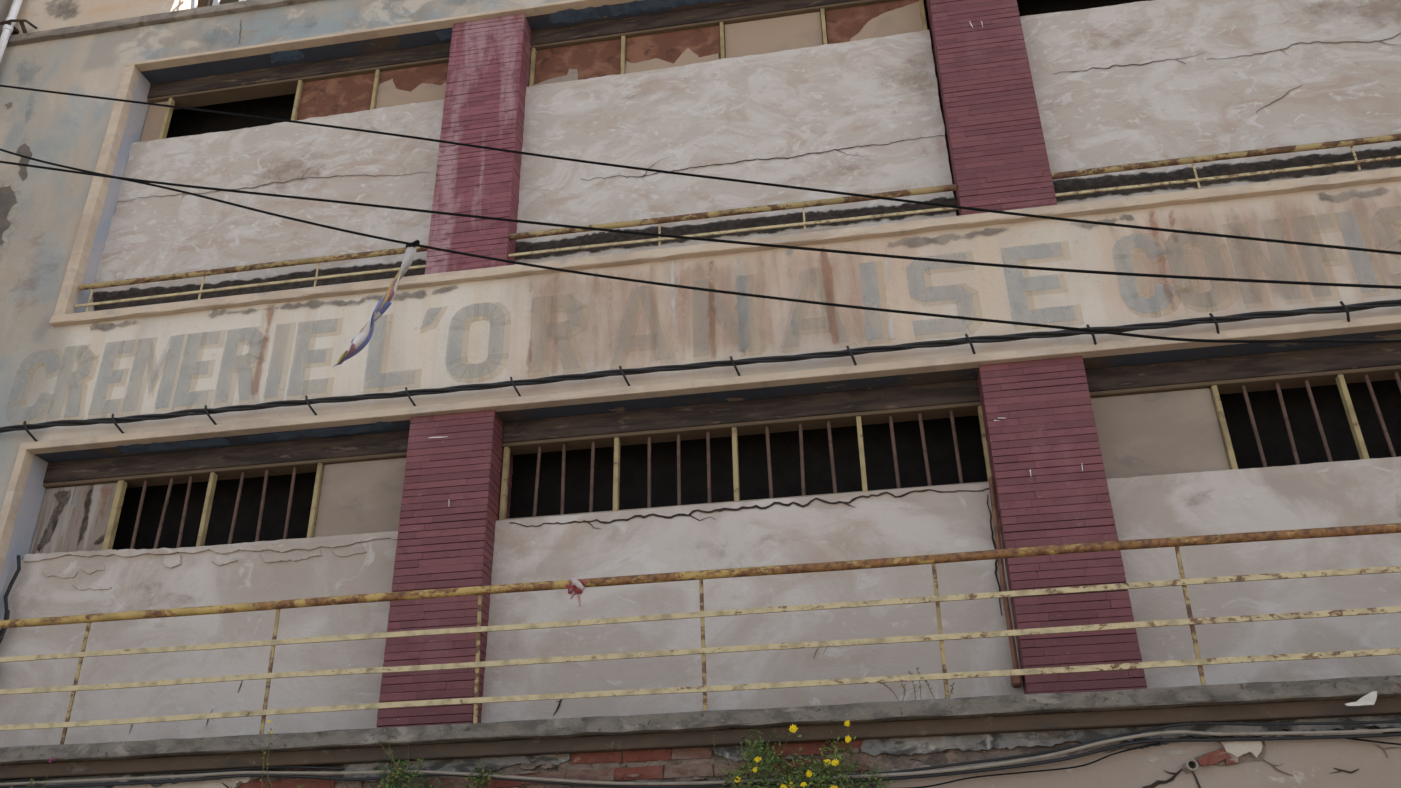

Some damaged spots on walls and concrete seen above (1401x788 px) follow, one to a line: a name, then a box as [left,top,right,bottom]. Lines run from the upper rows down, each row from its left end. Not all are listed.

crack [1053,33,1401,113]
peeling [0,143,32,248]
peeling [23,536,397,590]
crack [509,488,1002,616]
spalling [237,769,363,788]
spalling [383,740,883,788]
spalling [1194,741,1266,766]